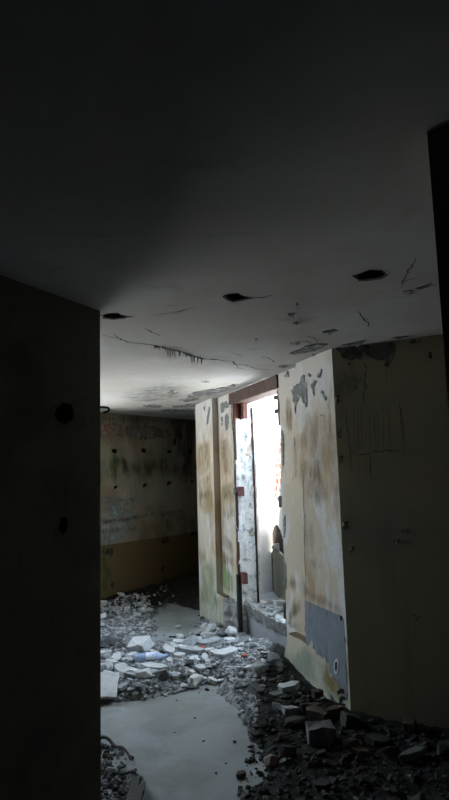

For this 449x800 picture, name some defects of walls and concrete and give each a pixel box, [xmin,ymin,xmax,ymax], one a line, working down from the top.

crack [104,305,274,370]
flaking render [278,329,420,377]
flaking render [143,381,239,431]
flaking render [291,369,341,414]
water stain [122,427,212,512]
peeling [304,600,348,701]